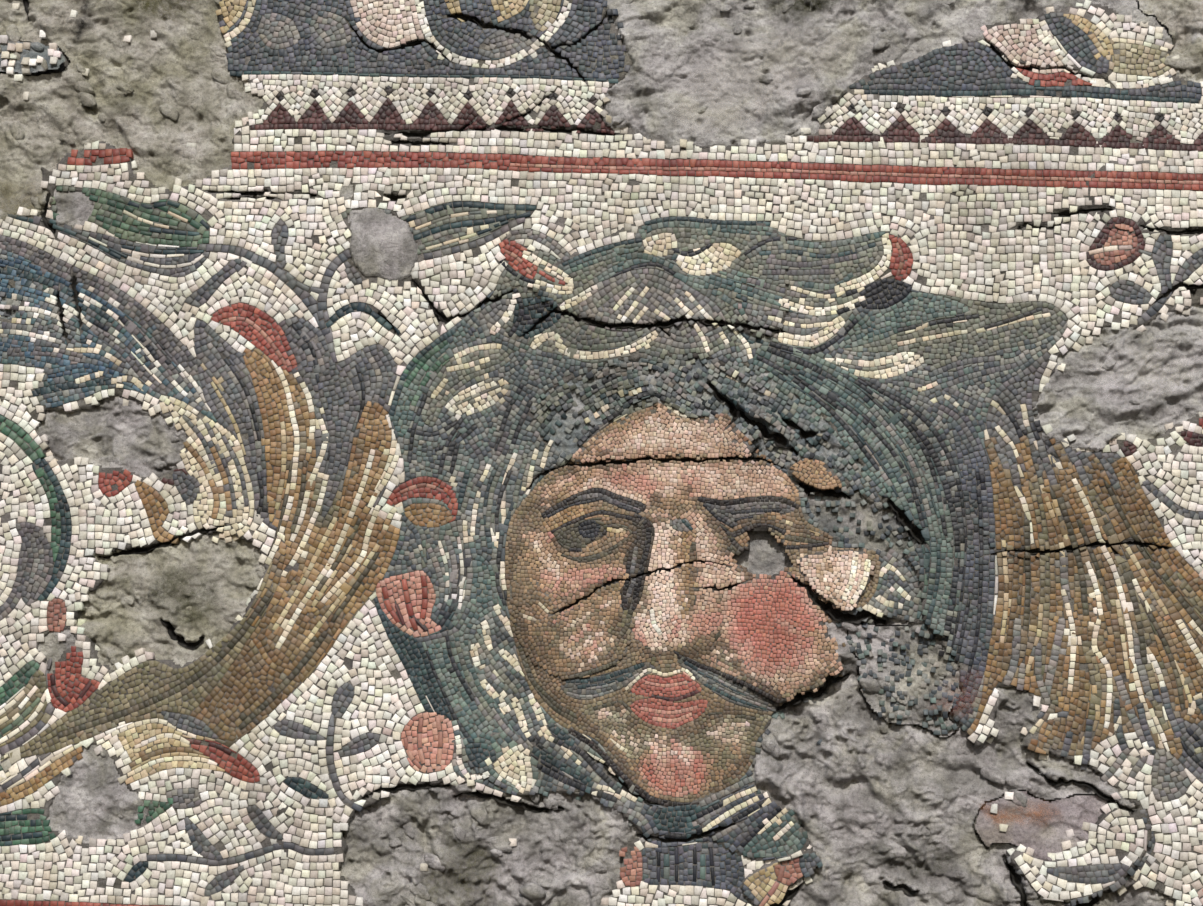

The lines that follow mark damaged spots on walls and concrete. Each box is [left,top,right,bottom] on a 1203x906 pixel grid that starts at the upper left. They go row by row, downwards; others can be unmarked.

spalling [0,0,265,227]
crack [449,12,607,81]
spalling [602,0,1203,149]
crack [1018,208,1113,229]
crack [1155,283,1203,302]
spalling [1032,305,1203,451]
spalling [38,533,267,674]
crack [556,560,739,613]
crack [792,578,886,624]
crack [991,541,1167,555]
spalling [751,614,1140,906]
spalling [340,782,643,906]